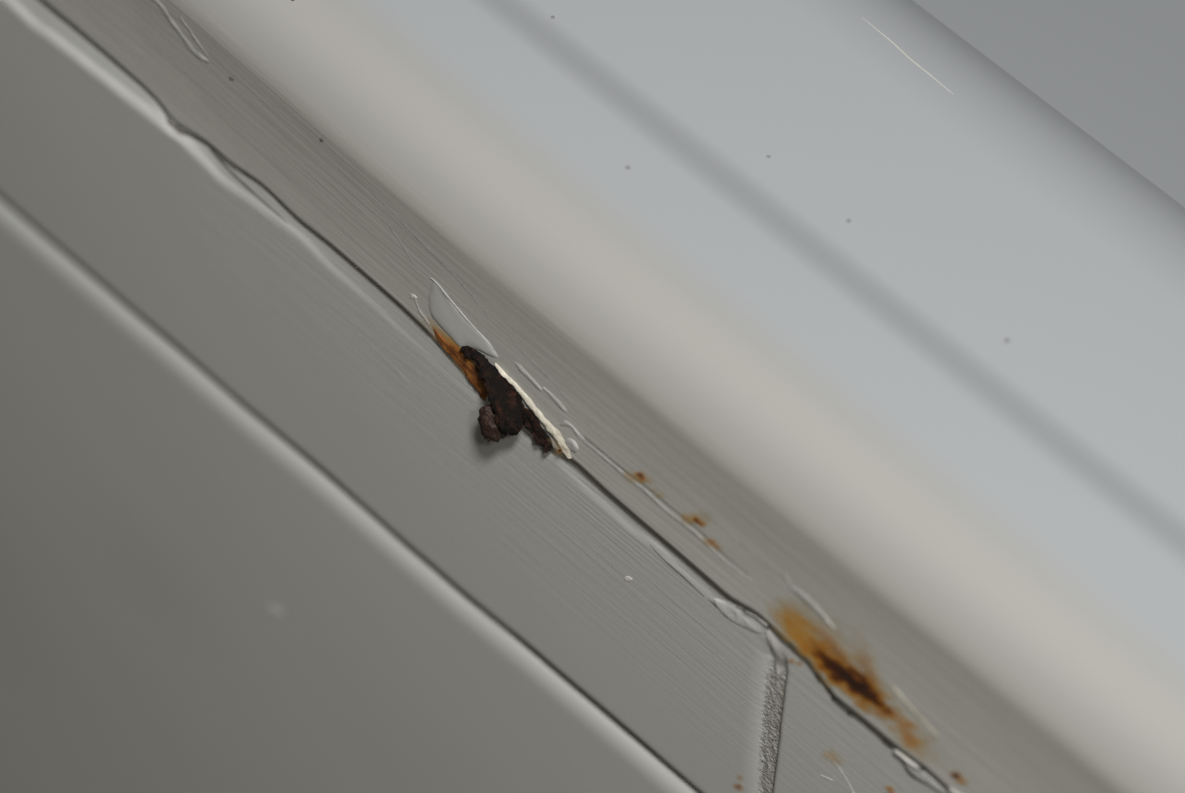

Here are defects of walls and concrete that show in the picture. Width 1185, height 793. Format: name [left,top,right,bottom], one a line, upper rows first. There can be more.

crack [39,0,428,335]
peeling [414,278,572,459]
crack [552,436,949,793]
corrosion [779,608,920,747]